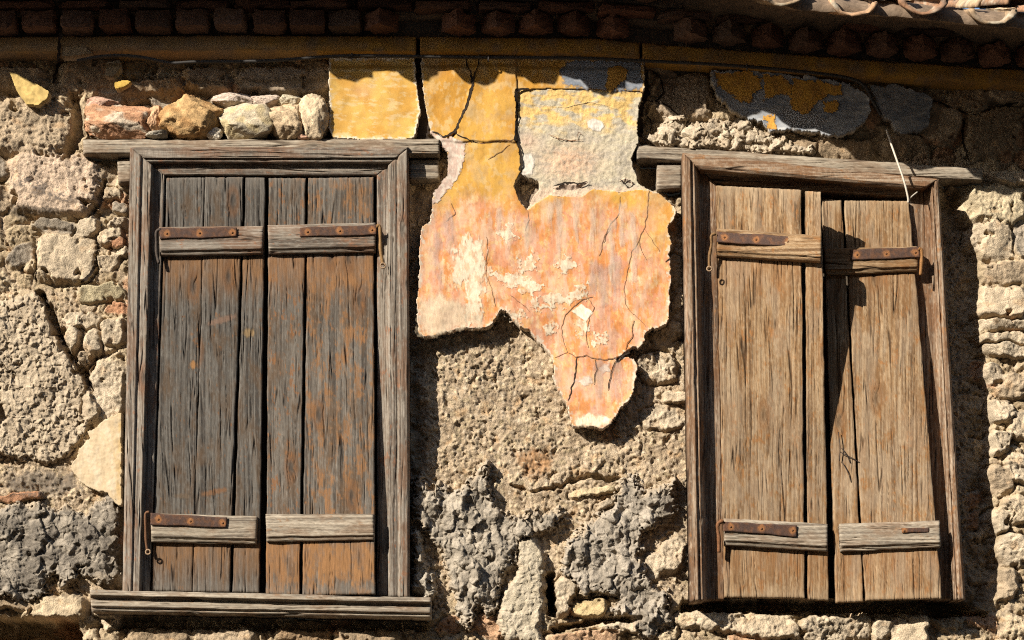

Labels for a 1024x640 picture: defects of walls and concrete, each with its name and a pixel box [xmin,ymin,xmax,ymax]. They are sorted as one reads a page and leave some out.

crack [415,41,529,171]
crack [637,47,678,137]
flaking render [710,69,933,139]
flaking render [328,55,676,431]
crack [557,179,671,400]